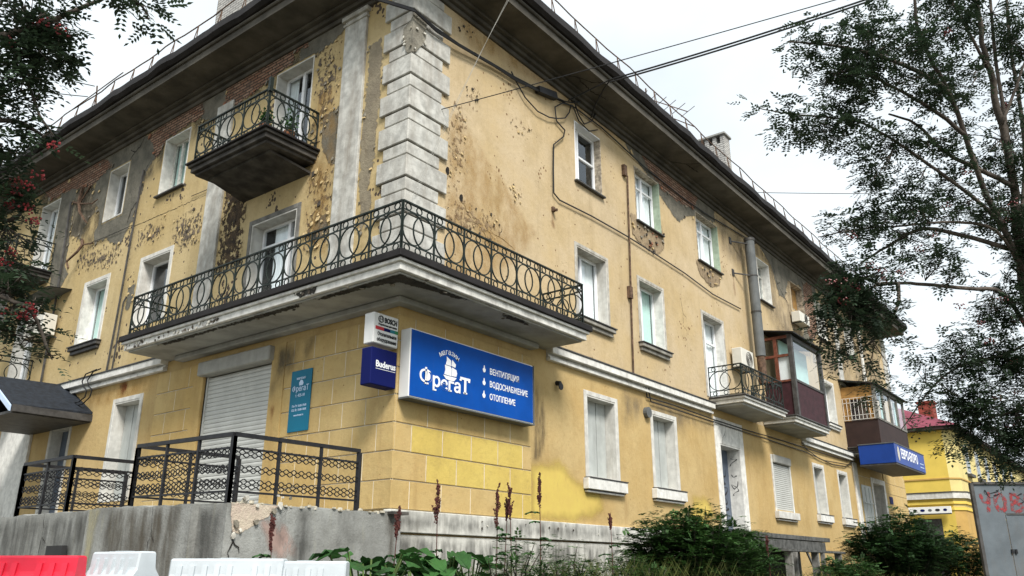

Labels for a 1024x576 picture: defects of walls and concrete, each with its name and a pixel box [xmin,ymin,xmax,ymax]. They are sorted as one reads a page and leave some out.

flaking render [45,23,345,288]
peeling [446,86,500,242]
flaking render [630,213,665,254]
flaking render [697,260,721,287]
flaking render [231,495,317,556]